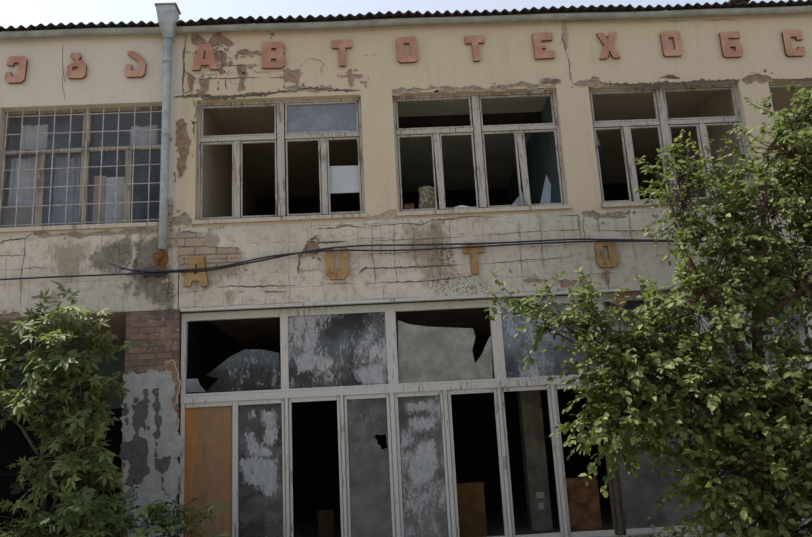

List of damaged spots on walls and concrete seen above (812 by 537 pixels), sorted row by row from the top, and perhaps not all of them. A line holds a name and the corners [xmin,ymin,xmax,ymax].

flaking render [185,32,261,97]
flaking render [277,68,333,94]
flaking render [337,68,369,89]
flaking render [391,80,556,96]
flaking render [741,69,773,85]
peeling [170,118,197,183]
crack [0,232,45,310]
crack [108,238,157,273]
flaking render [33,197,248,277]
crack [179,231,237,259]
crack [226,214,667,294]
peeling [119,324,184,537]